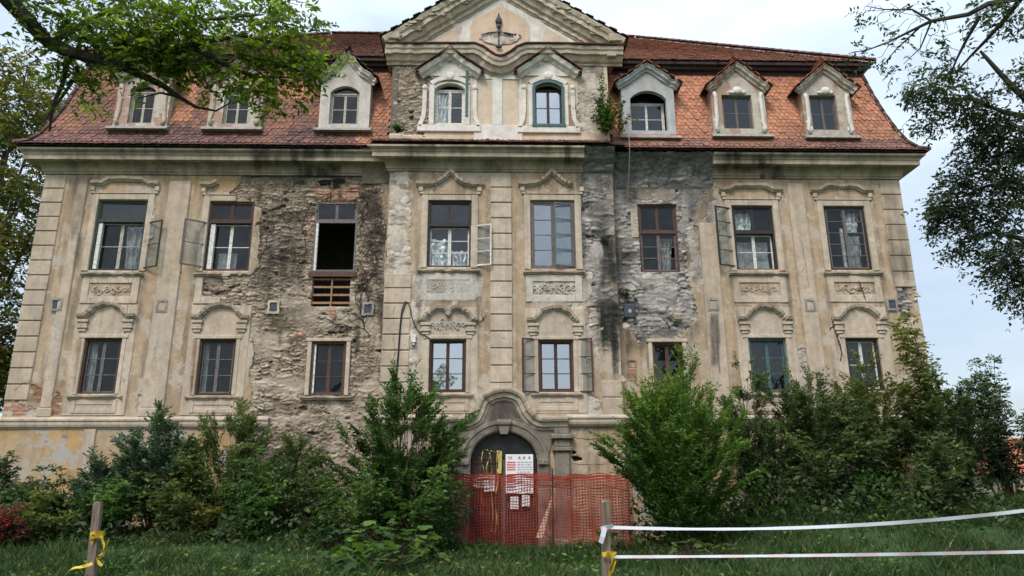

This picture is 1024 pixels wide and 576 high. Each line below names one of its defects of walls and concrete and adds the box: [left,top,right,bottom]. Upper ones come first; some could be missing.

flaking render [306,178,364,242]
flaking render [386,171,413,274]
water stain [596,208,621,286]
flaking render [684,182,723,285]
water stain [599,296,621,360]
flaking render [0,385,62,417]